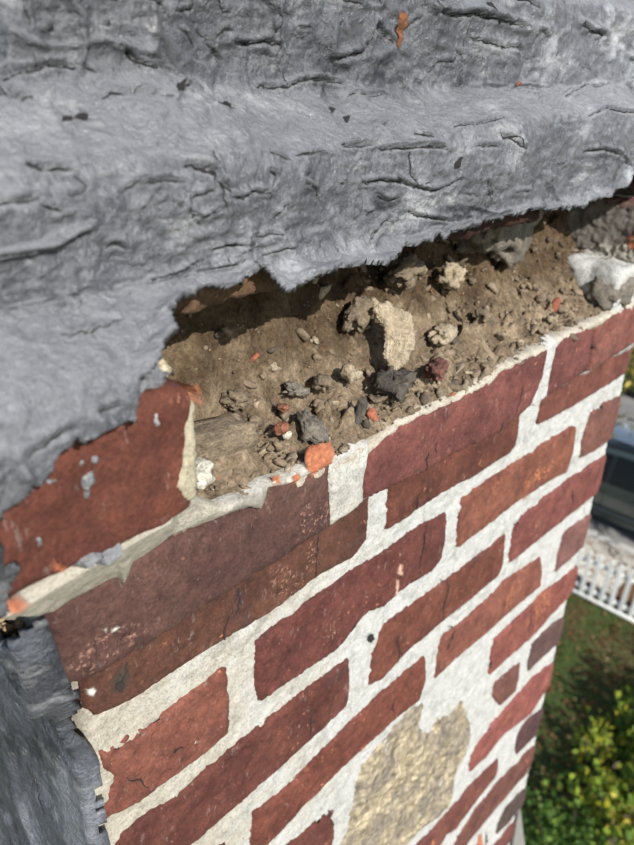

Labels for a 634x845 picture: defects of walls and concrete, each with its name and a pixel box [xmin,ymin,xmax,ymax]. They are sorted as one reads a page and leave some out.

crack [0,51,97,102]
crack [102,43,204,100]
crack [153,0,313,63]
crack [257,0,540,97]
corrosion [396,12,408,48]
crack [455,117,528,149]
crack [0,162,87,212]
crack [122,133,461,281]
peeling [371,300,416,371]
spalling [292,442,335,483]
peeling [54,543,123,572]
spalling [7,597,29,614]